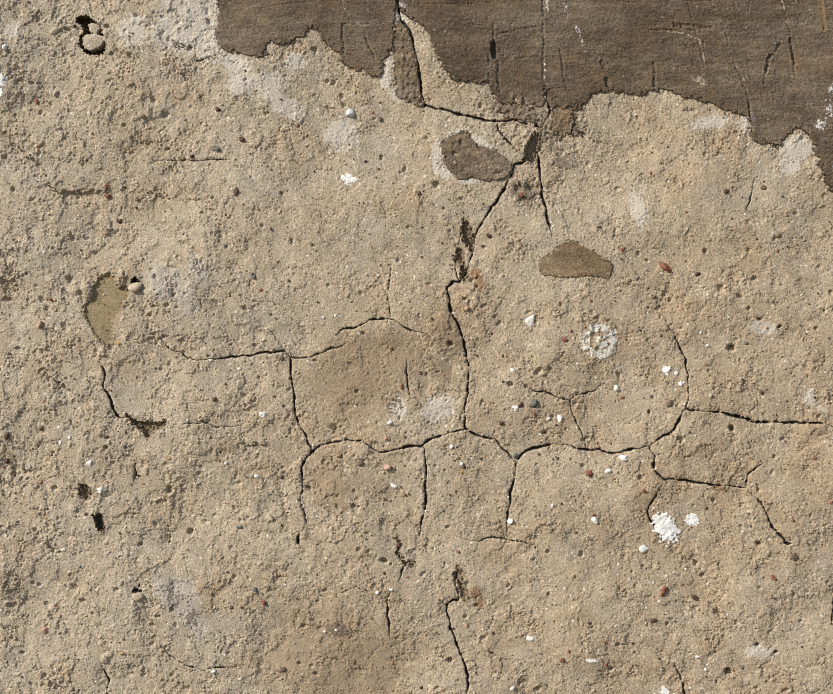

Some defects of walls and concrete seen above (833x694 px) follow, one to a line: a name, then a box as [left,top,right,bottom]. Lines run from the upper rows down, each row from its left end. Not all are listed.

flaking render [214,0,833,214]
crack [161,0,833,548]
crack [99,361,128,418]
crack [386,565,406,640]
crack [446,572,470,693]